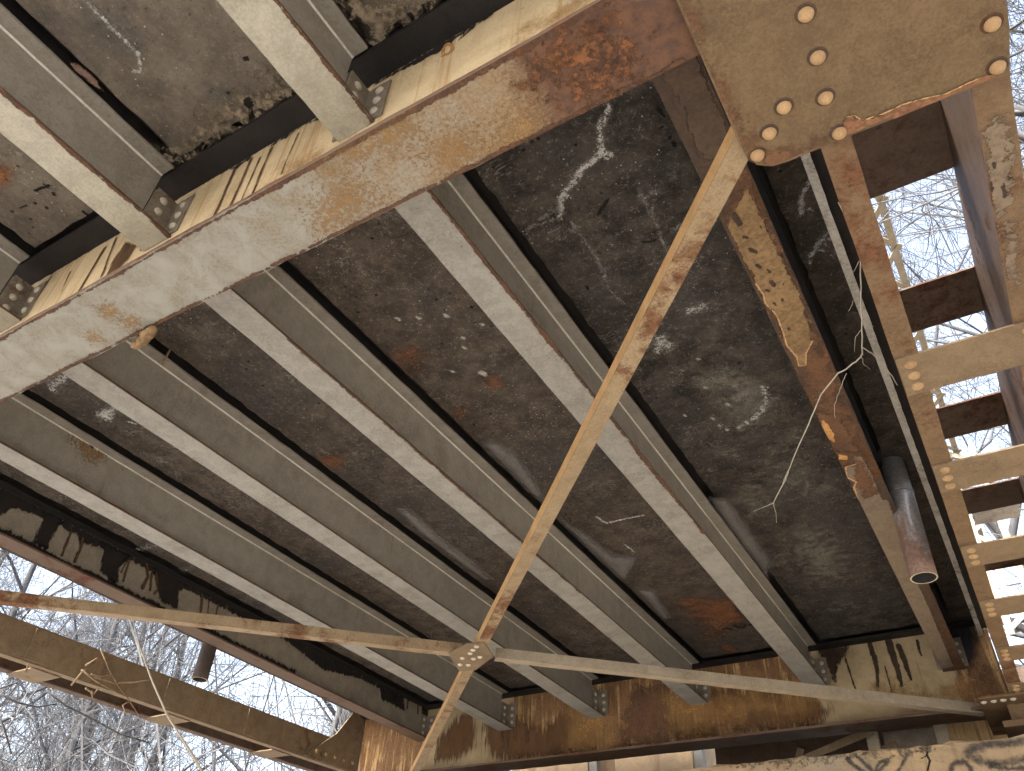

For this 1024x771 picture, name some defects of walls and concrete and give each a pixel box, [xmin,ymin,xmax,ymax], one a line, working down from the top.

peeling [663,57,727,160]
rust [0,0,686,403]
crack [530,102,620,299]
peeling [980,112,1023,286]
rust [609,416,706,534]
peeling [726,167,953,669]
water stain [0,488,253,619]
water stain [201,628,295,673]
water stain [280,637,410,711]
rust [434,678,829,763]
water stain [818,646,856,689]
water stain [867,639,912,690]